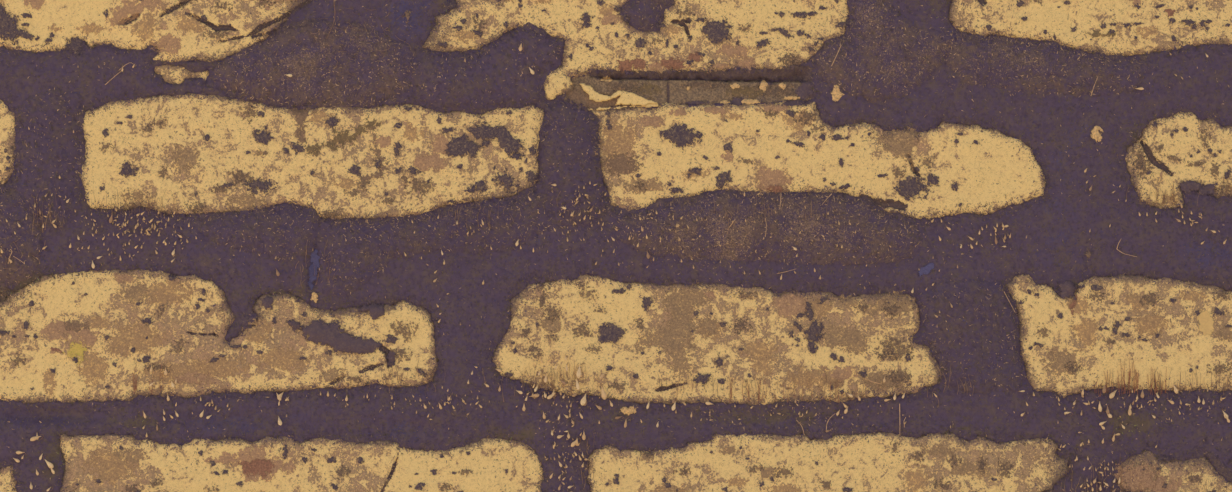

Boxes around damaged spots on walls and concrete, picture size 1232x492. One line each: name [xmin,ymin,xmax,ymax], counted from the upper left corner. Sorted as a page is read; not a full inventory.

crack [122,0,318,43]